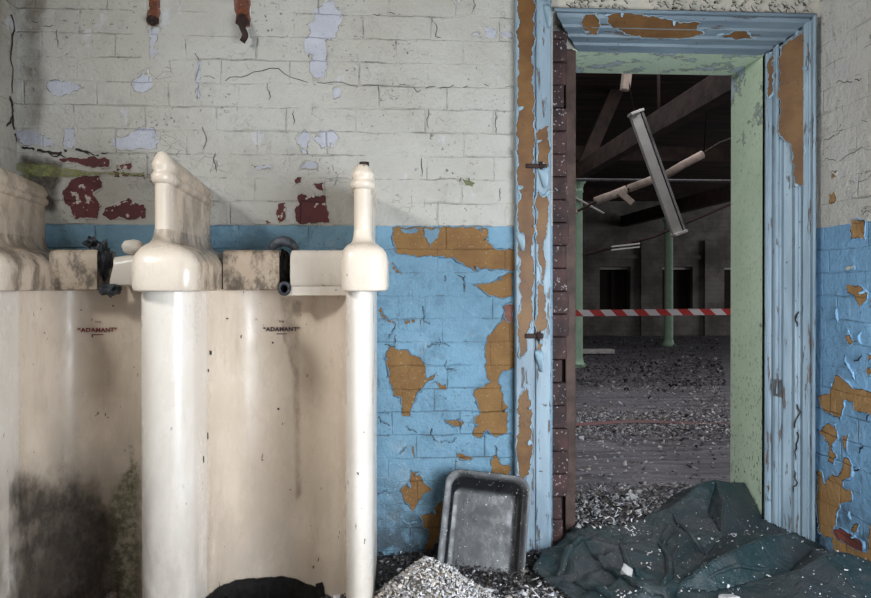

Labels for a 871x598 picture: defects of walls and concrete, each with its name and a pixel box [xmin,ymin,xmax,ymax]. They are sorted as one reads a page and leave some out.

crack [6,14,107,158]
corrosion [237,0,248,25]
peeling [303,0,343,81]
peeling [581,13,705,40]
peeling [766,31,808,188]
peeling [16,125,161,221]
peeling [263,129,340,225]
peeling [384,0,552,478]
peeling [849,218,866,241]
peeling [846,284,871,308]
peeling [399,470,443,552]
peeling [816,374,871,561]